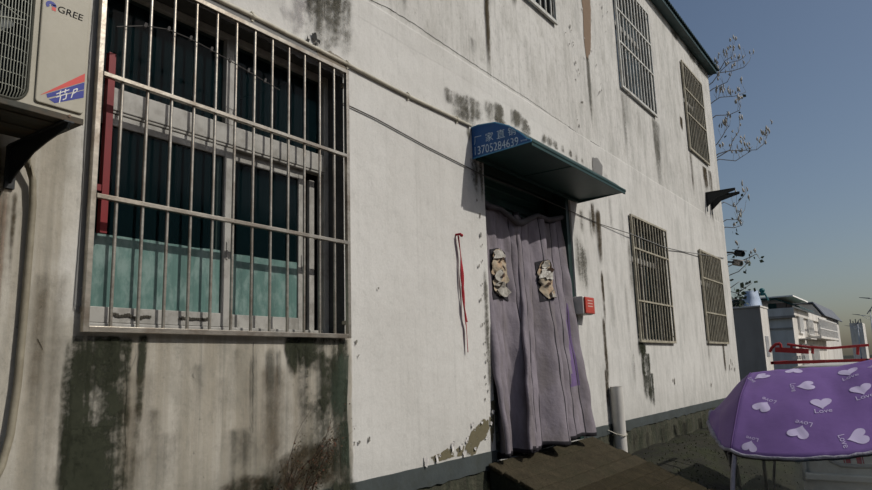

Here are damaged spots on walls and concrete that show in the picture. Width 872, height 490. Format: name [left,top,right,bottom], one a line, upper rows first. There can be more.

water stain [295,0,351,47]
water stain [446,88,531,139]
water stain [0,195,17,243]
water stain [580,204,602,260]
flaking render [425,260,495,467]
water stain [639,343,655,404]
water stain [59,336,148,490]
water stain [268,337,353,490]